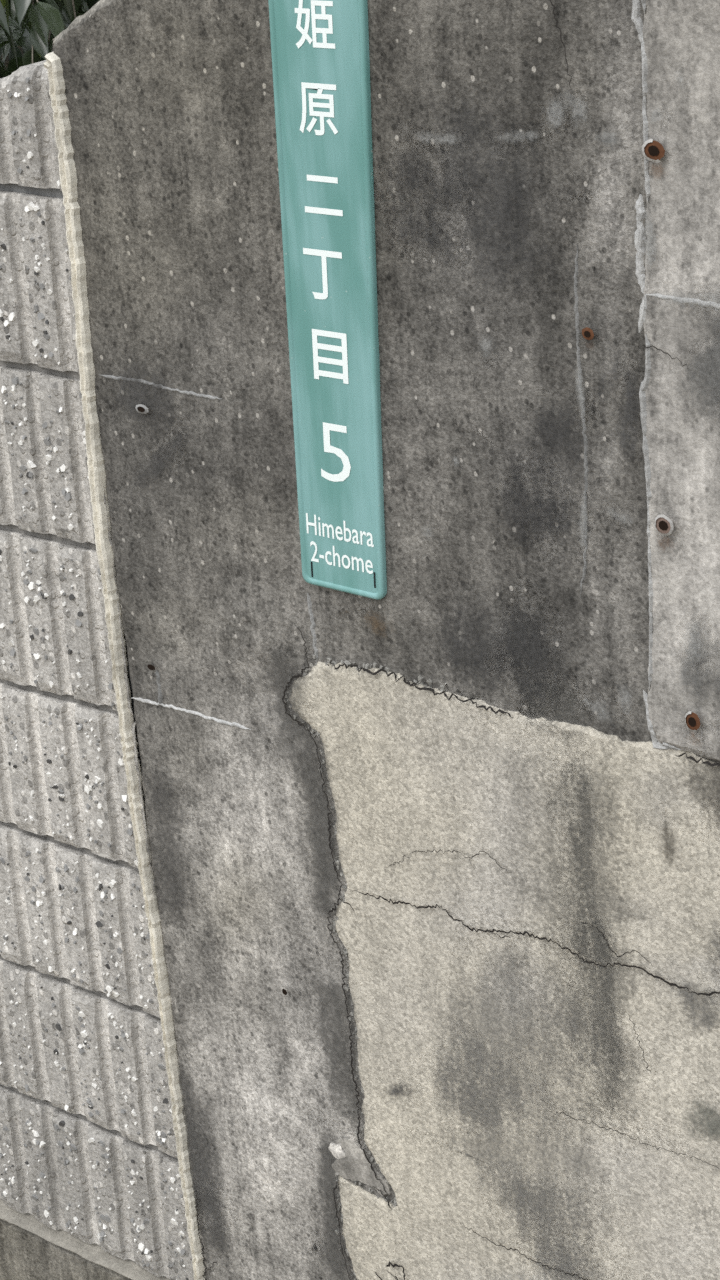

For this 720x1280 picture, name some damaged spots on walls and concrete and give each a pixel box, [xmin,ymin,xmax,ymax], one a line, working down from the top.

water stain [689,764,720,822]
crack [282,625,720,1209]
peeling [284,654,720,1280]
water stain [692,1102,720,1137]
crack [333,1182,405,1280]
crack [460,1223,588,1280]